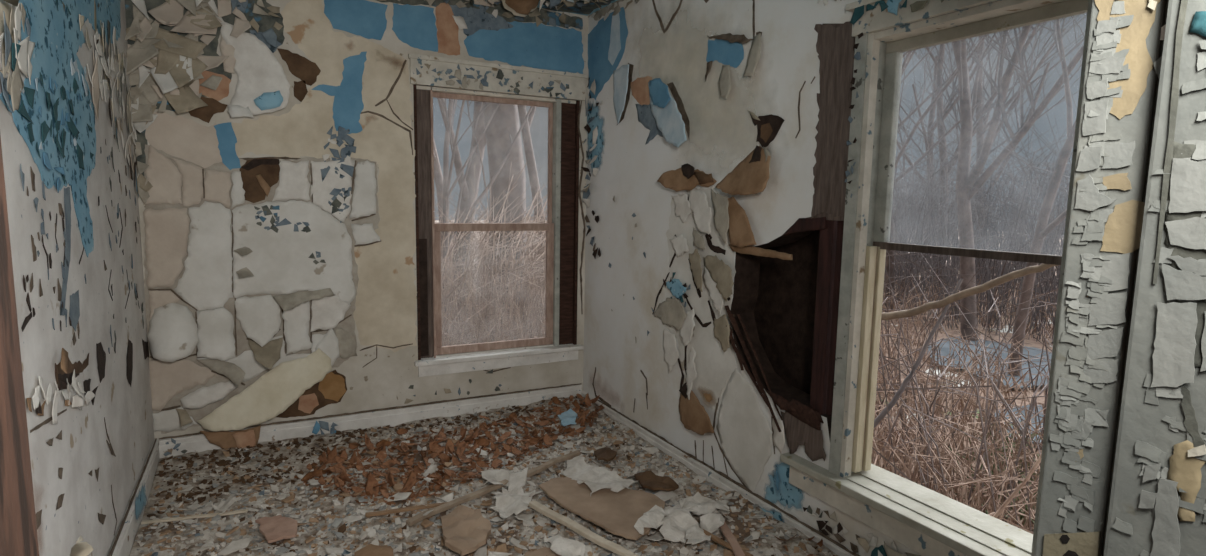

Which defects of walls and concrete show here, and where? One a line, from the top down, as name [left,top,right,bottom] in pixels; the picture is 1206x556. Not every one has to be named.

crack [652,0,709,33]
crack [749,0,757,38]
crack [361,60,413,155]
flaking render [0,0,690,456]
spalling [635,0,959,432]
peeling [1074,0,1166,385]
peeling [1138,142,1206,556]
peeling [36,468,65,529]
peeling [70,536,93,556]
peeling [803,505,920,556]